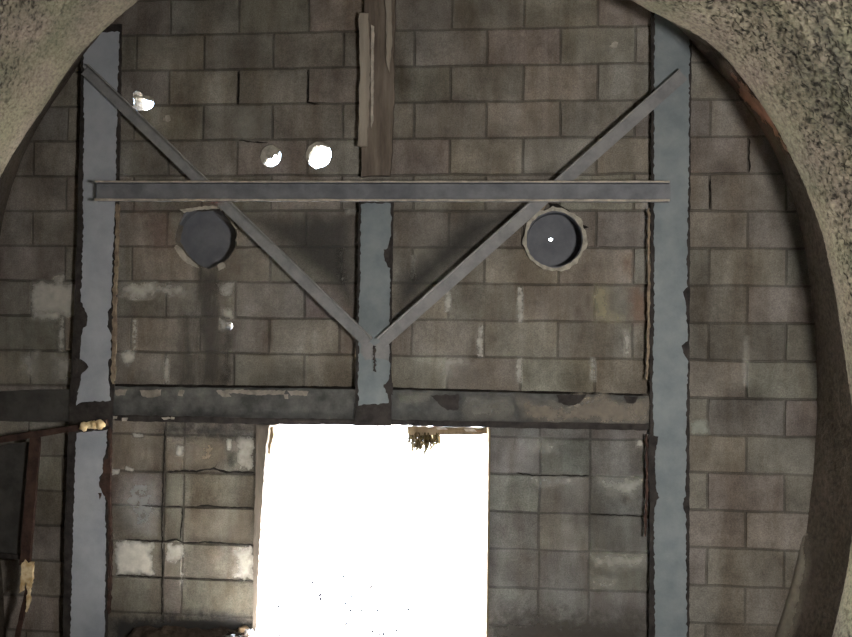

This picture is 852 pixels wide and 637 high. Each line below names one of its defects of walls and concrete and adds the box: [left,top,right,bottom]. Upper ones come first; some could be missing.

rust [728,69,790,154]
peeling [71,307,88,405]
peeling [432,394,512,418]
peeling [523,394,647,423]
peeling [98,459,111,499]
leakage [116,541,154,575]
leakage [167,544,183,561]
leakage [236,548,253,578]